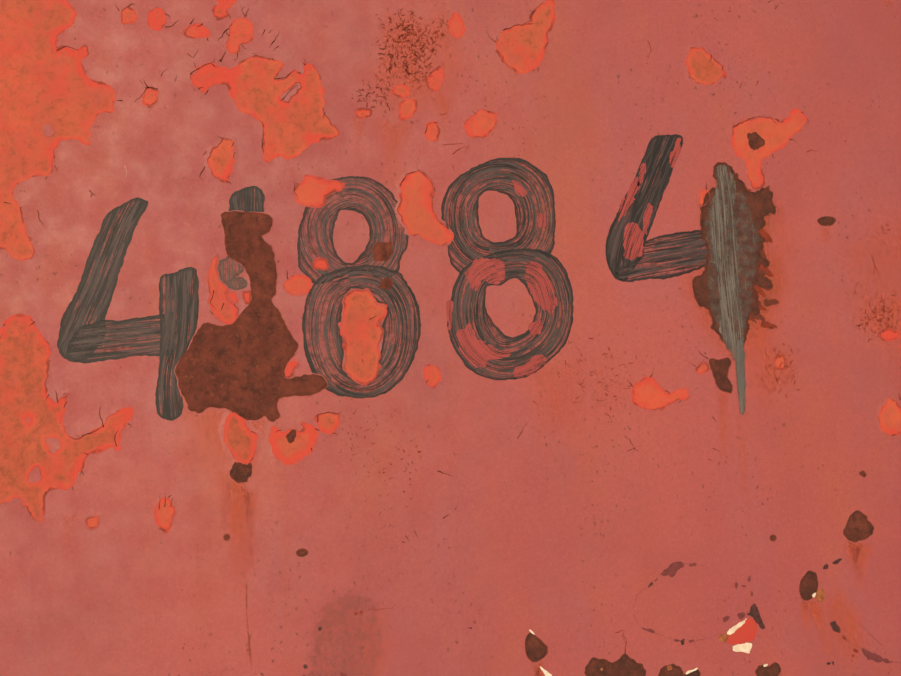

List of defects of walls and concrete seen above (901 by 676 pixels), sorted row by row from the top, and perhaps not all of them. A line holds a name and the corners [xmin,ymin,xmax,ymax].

peeling [114,0,346,168]
peeling [0,0,123,267]
peeling [292,174,346,209]
peeling [392,167,455,249]
peeling [726,103,813,192]
corrosion [174,210,329,423]
peeling [338,288,388,386]
corrosion [692,162,780,395]
peeling [0,308,138,528]
corrosion [842,509,876,570]
corrosion [583,634,701,676]
peeling [718,576,765,653]